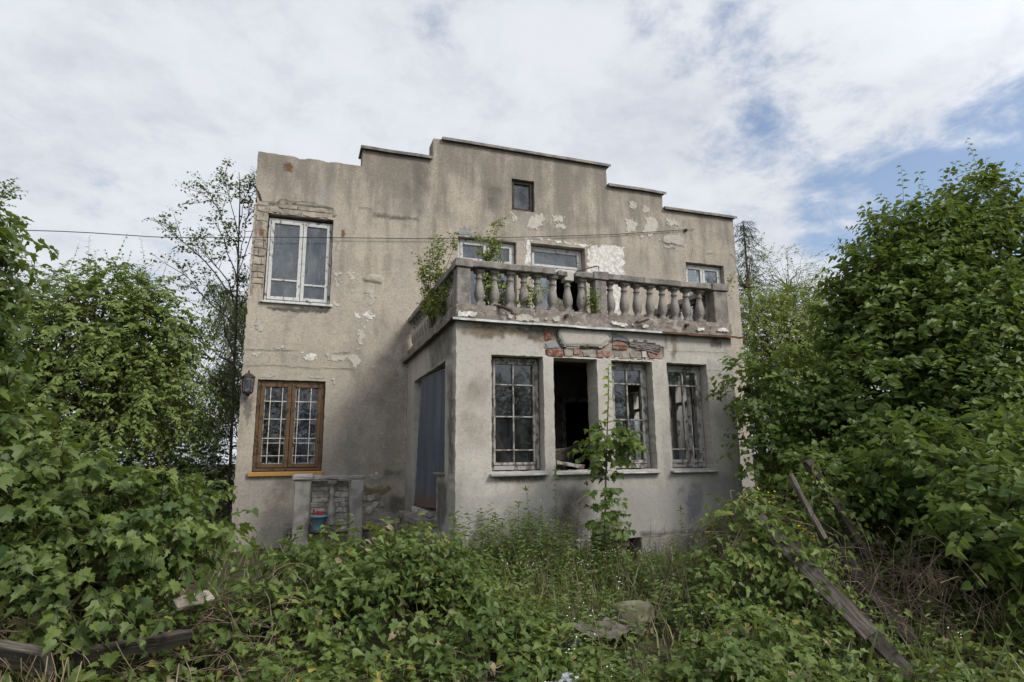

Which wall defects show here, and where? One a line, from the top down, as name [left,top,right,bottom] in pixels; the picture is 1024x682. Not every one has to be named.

flaking render [624,200,685,249]
flaking render [273,270,378,368]
spalling [507,212,664,360]